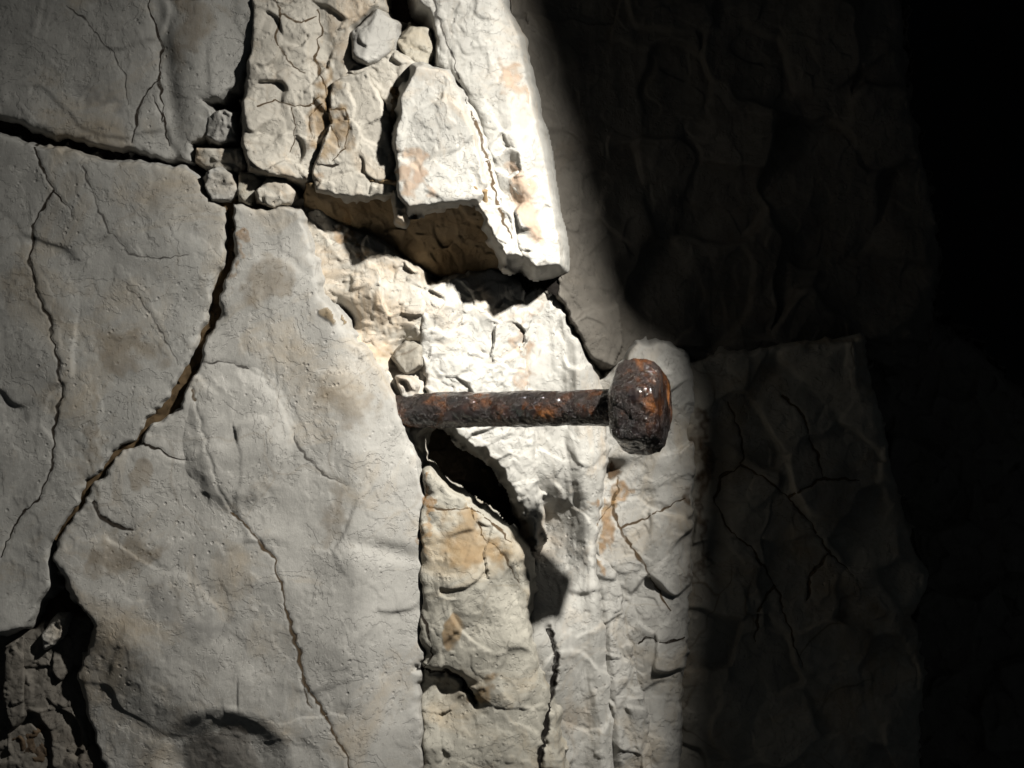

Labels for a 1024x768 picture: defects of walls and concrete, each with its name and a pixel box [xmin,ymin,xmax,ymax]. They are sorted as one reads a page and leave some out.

spalling [508,163,544,244]
crack [0,0,207,557]
crack [55,198,249,541]
crack [294,434,347,486]
crack [597,479,685,611]
crack [230,512,350,768]
crack [537,628,560,768]
crack [638,636,685,644]